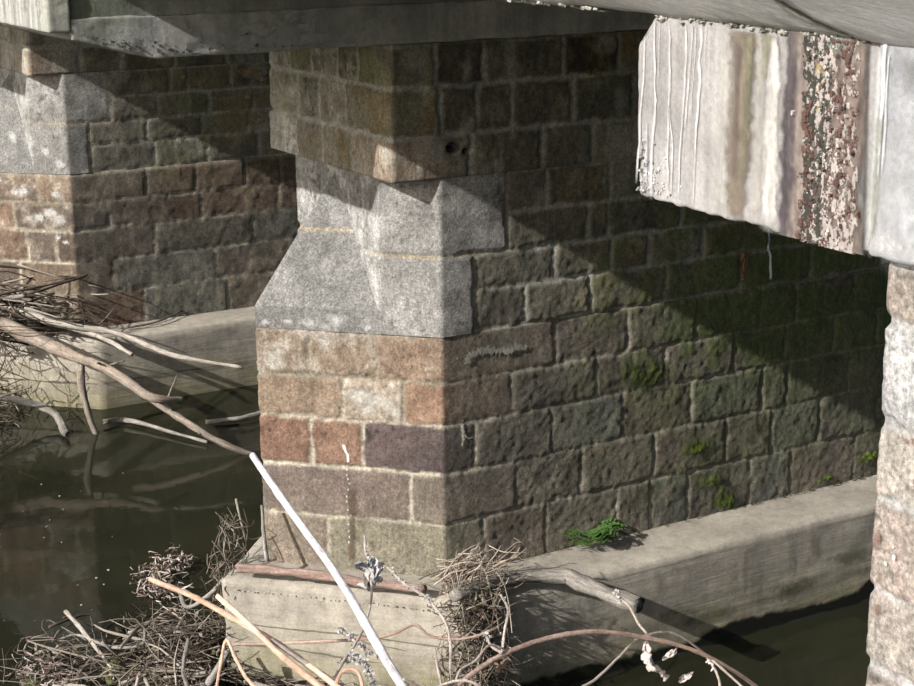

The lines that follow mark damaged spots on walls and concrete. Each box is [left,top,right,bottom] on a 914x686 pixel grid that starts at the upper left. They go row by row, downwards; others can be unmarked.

water stain [636,23,657,189]
water stain [667,26,703,198]
spalling [655,15,788,35]
water stain [713,31,780,279]
rust [778,31,869,255]
water stain [518,579,874,686]